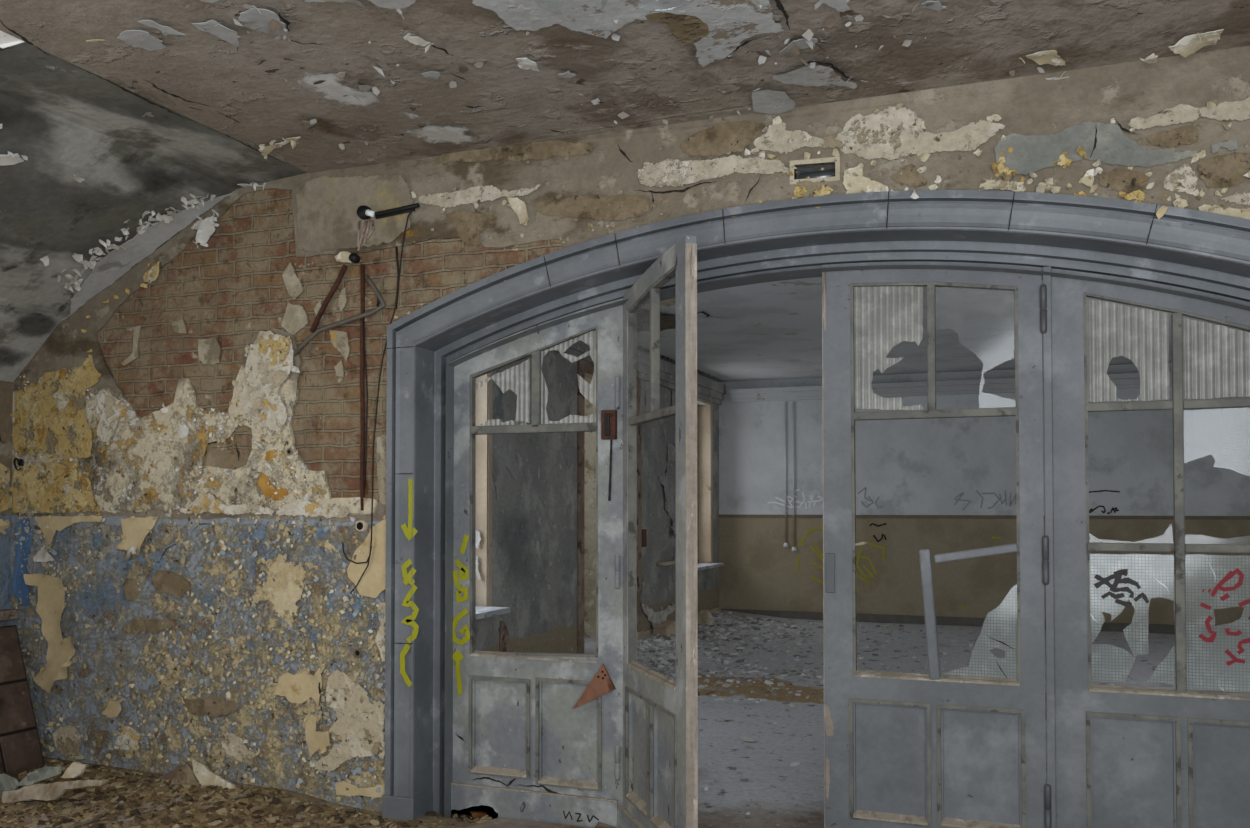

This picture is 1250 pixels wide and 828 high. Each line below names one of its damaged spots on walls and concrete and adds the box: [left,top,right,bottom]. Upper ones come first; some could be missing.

peeling [305,0,416,19]
peeling [86,5,291,51]
peeling [403,33,433,53]
peeling [472,0,1250,220]
peeling [258,137,301,159]
spalling [434,140,595,171]
water stain [20,315,53,334]
spalling [0,182,562,693]
peeling [183,690,238,719]
peeling [102,698,145,752]
peeling [219,733,260,765]
peeling [272,667,385,799]